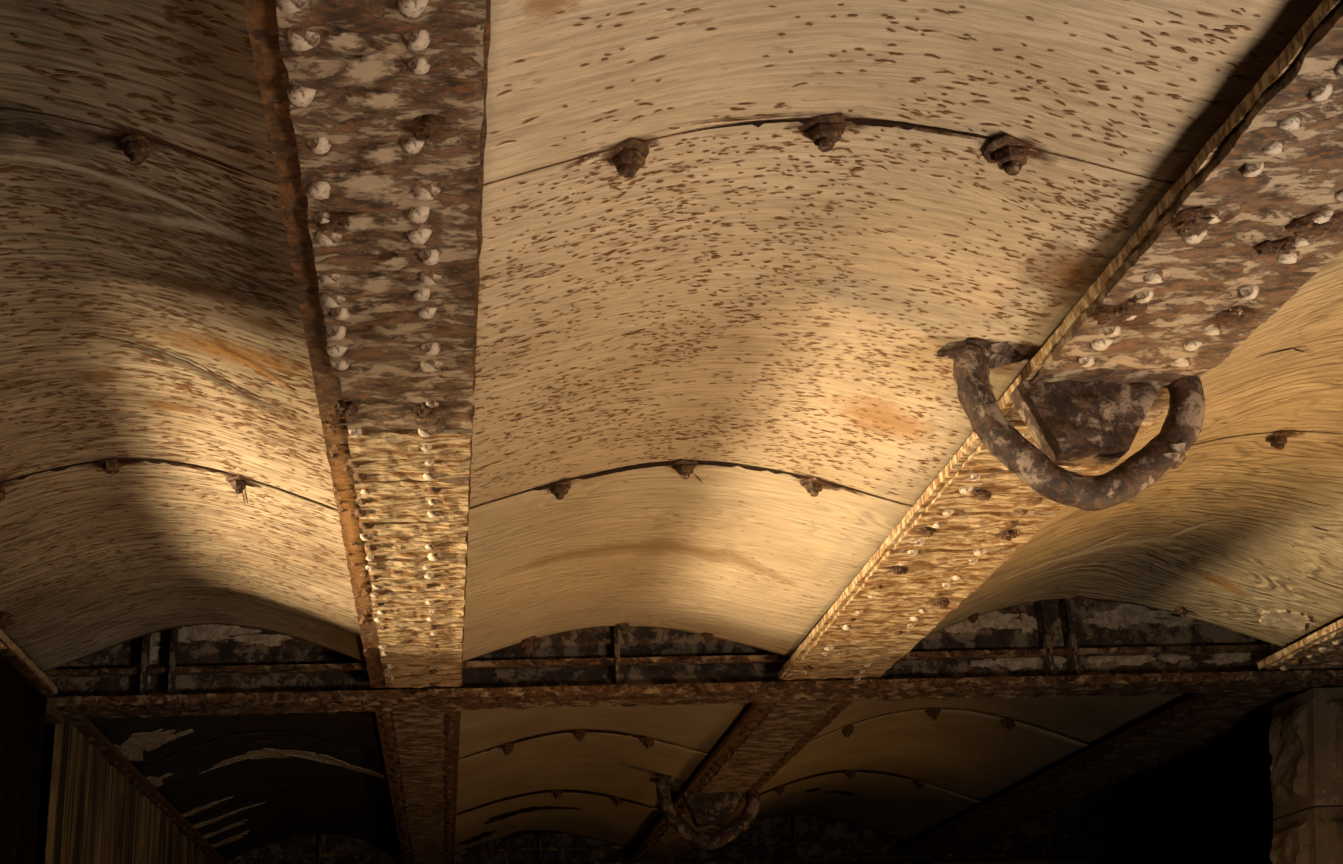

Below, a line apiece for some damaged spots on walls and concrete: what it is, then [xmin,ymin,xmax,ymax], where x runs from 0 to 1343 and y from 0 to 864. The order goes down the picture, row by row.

rust [410,114,447,143]
rust [1254,212,1343,257]
rust [471,9,1260,501]
rust [413,403,441,420]
rust [919,527,938,538]
rust [888,565,909,575]
rust [996,529,1028,605]
rust [934,597,950,609]